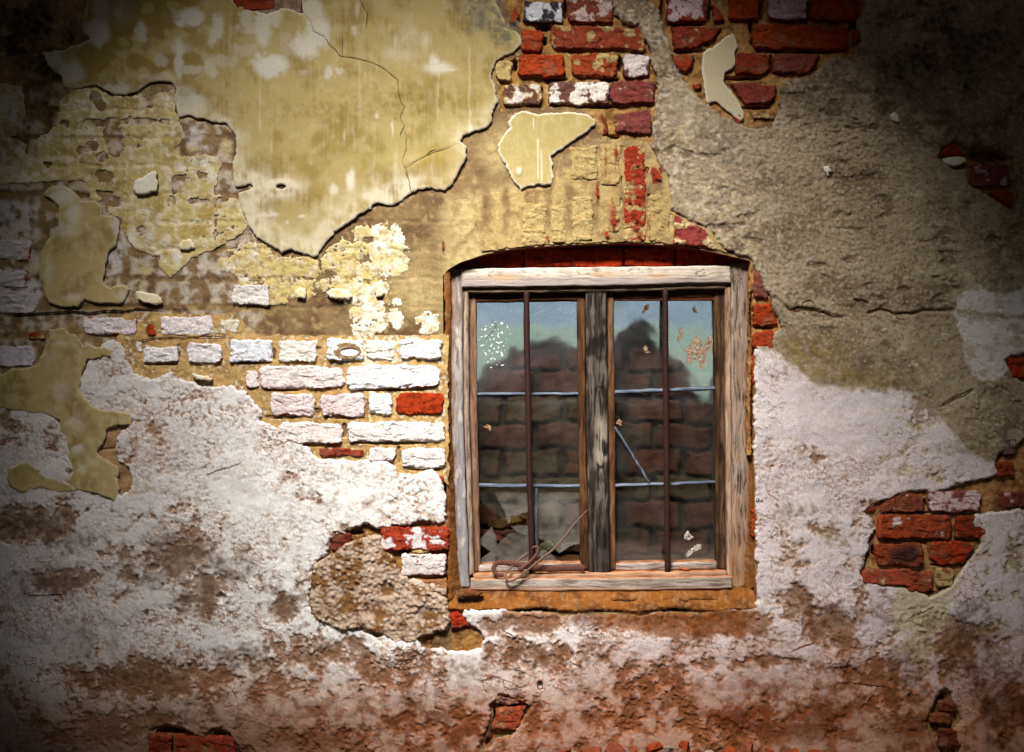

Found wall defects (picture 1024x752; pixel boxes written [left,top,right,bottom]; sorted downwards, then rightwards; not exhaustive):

crack [303,1,448,189]
spalling [648,0,867,128]
spalling [939,144,1018,209]
flaking render [0,0,726,500]
crack [786,298,950,319]
spalling [860,439,1024,593]
water stain [141,532,250,580]
water stain [261,585,299,612]
spalling [317,518,484,651]
water stain [787,584,858,624]
water stain [504,643,601,670]
spalling [482,695,526,748]